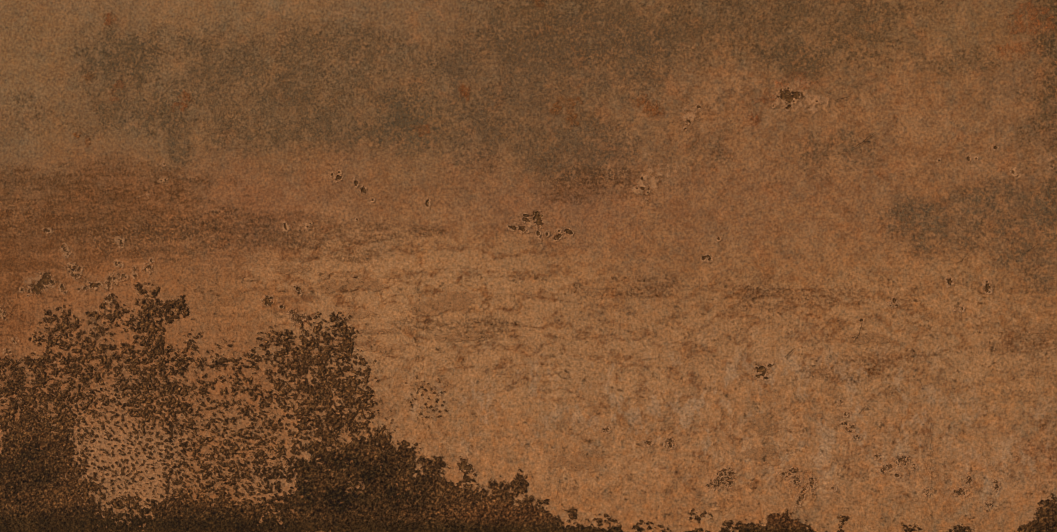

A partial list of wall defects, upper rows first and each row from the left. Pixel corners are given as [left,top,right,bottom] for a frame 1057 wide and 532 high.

spalling [771,81,829,114]
spalling [506,210,574,242]
rust [0,169,341,336]